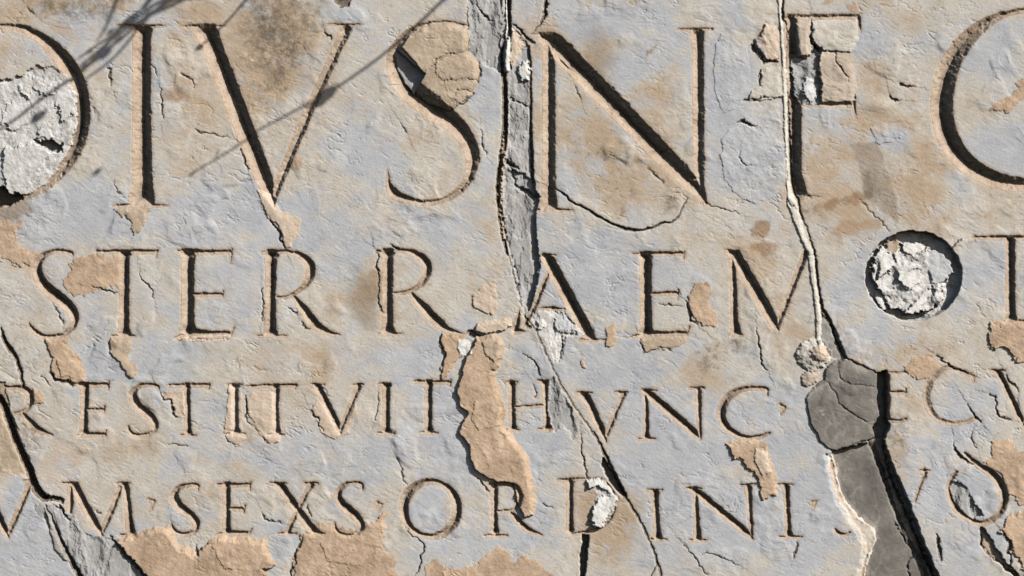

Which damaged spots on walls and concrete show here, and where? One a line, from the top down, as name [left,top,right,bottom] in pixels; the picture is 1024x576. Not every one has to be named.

peeling [749,19,859,107]
flaking render [0,65,78,207]
flaking render [395,0,584,362]
peeling [62,253,123,297]
crack [454,0,739,576]
crack [736,0,943,576]
flaking render [865,231,961,321]
crack [0,327,73,413]
peeling [439,280,537,517]
peeling [33,502,276,576]
flaking render [586,478,619,528]
peeling [726,438,778,501]